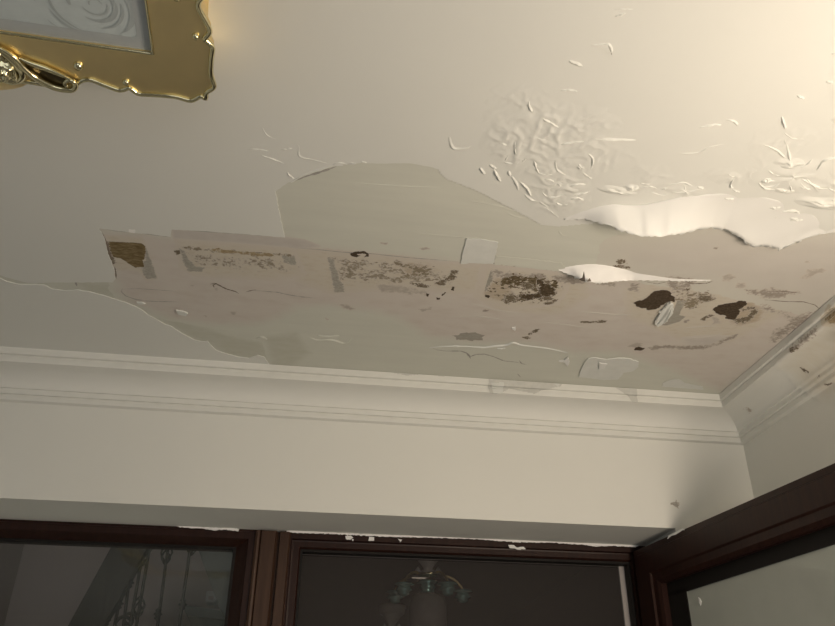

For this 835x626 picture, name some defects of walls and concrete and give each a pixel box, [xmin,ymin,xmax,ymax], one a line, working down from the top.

water stain [104,234,158,281]
water stain [174,246,301,272]
water stain [327,251,458,312]
flaking render [0,163,835,394]
water stain [477,266,585,312]
water stain [627,273,835,405]